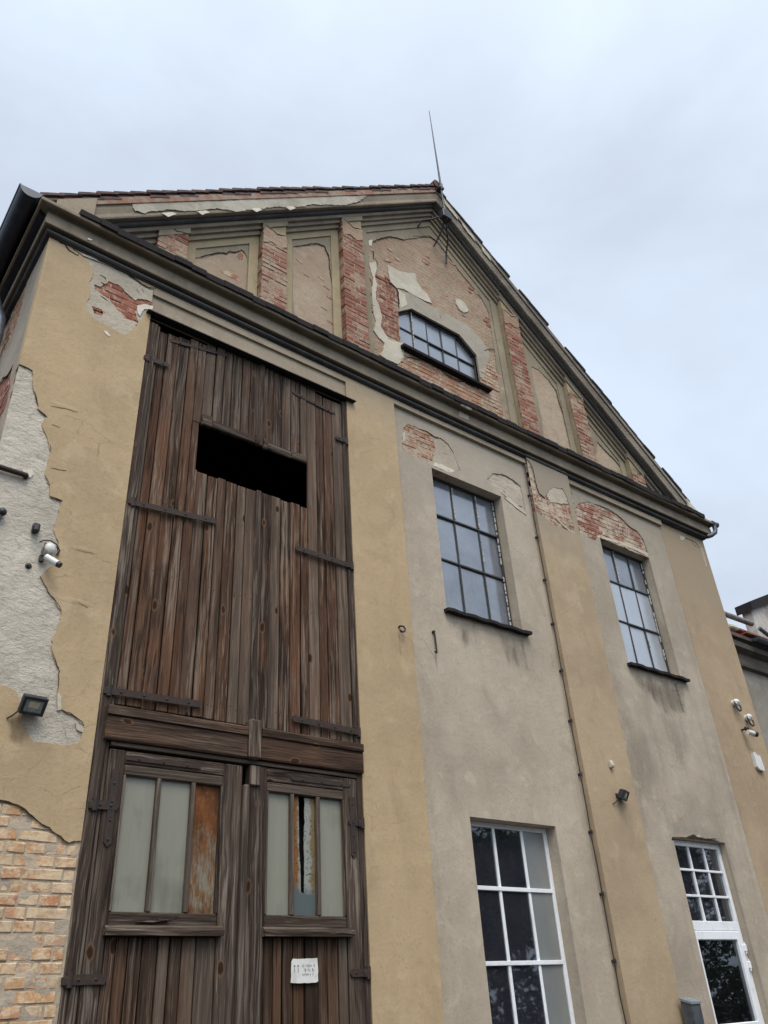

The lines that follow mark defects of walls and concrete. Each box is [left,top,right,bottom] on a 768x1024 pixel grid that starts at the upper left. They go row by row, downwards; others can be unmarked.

peeling [132,195,367,217]
flaking render [79,252,156,336]
peeling [155,219,646,487]
peeling [0,364,84,745]
flaking render [487,459,648,560]
flaking render [0,800,86,1024]
rust [187,785,219,914]